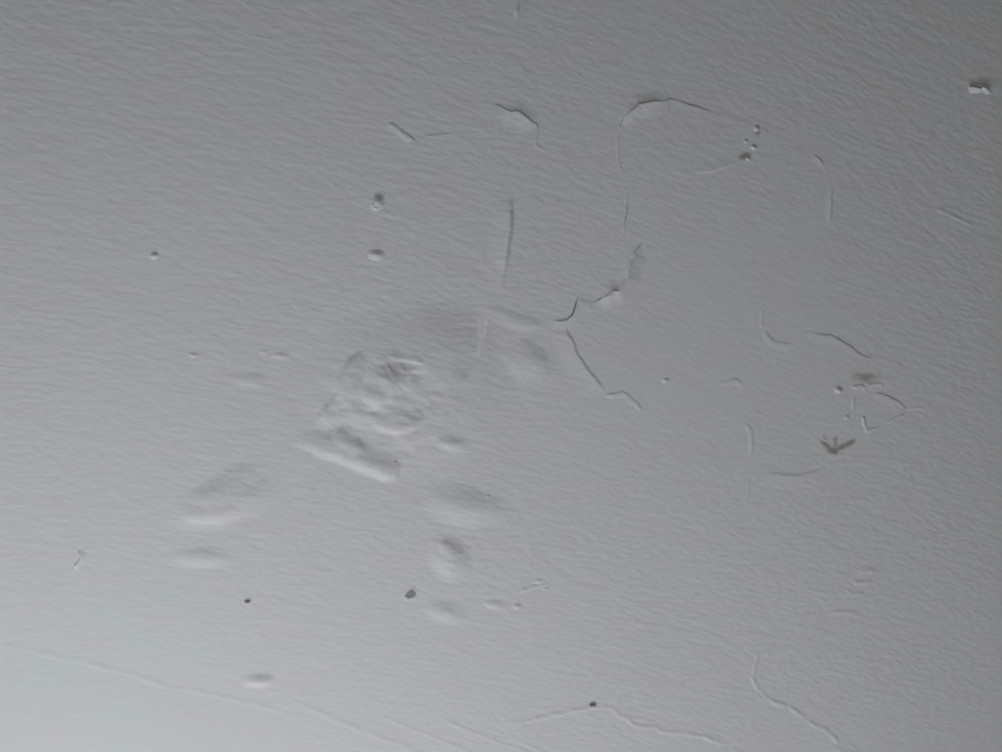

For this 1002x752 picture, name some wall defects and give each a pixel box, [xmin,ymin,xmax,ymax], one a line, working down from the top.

crack [549,296,642,412]
crack [802,331,867,362]